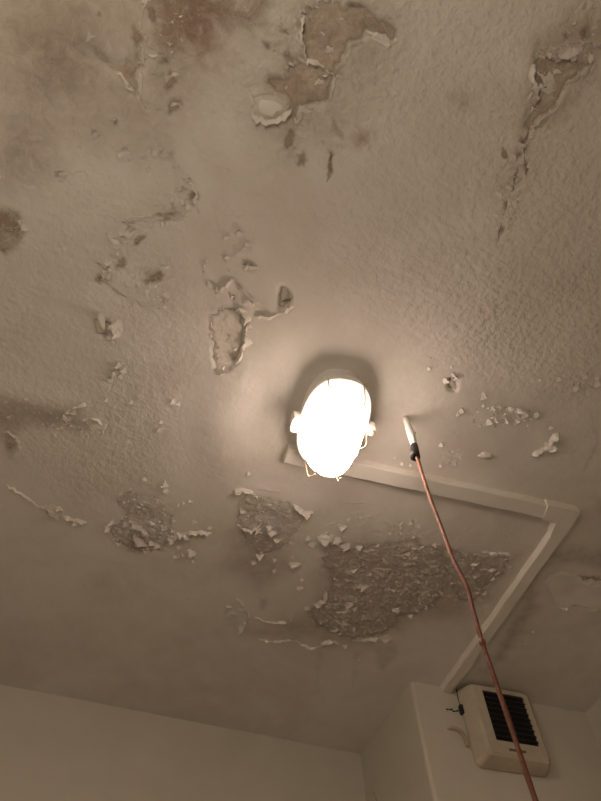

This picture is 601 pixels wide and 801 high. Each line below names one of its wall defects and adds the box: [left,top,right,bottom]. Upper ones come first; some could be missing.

peeling [264,0,400,164]
peeling [492,15,596,245]
peeling [96,176,200,284]
peeling [90,313,123,349]
peeling [202,229,294,376]
peeling [456,392,560,457]
peeling [104,480,212,564]
peeling [232,487,313,574]
peeling [257,516,514,651]